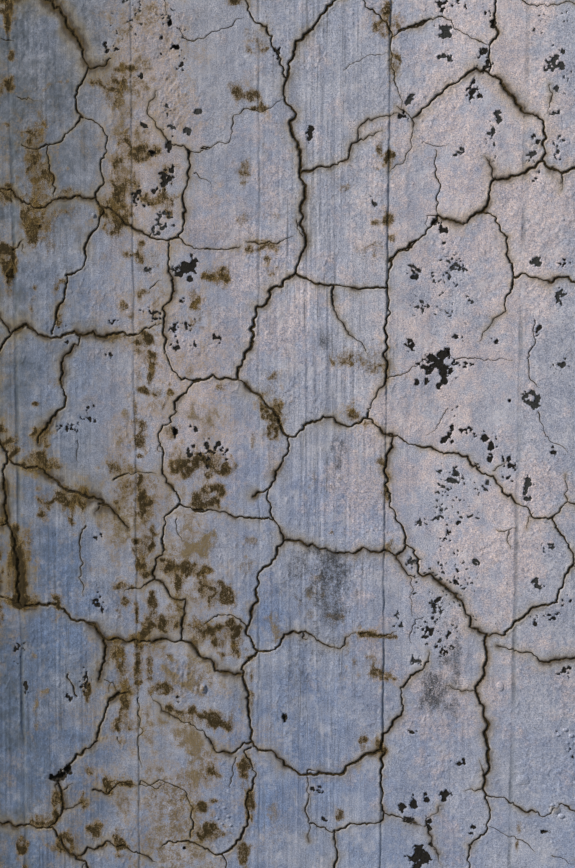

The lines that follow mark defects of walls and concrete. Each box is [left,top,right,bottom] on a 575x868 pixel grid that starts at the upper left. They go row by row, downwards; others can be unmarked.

rust [228,84,267,112]
rust [98,130,179,237]
crack [0,0,575,502]
peeling [415,334,474,390]
peeling [440,406,516,482]
rust [0,518,38,624]
rust [107,330,253,744]
crack [0,379,575,868]
peeling [406,550,480,657]
peeling [416,463,490,550]
rust [237,756,255,822]
peeling [404,842,433,868]